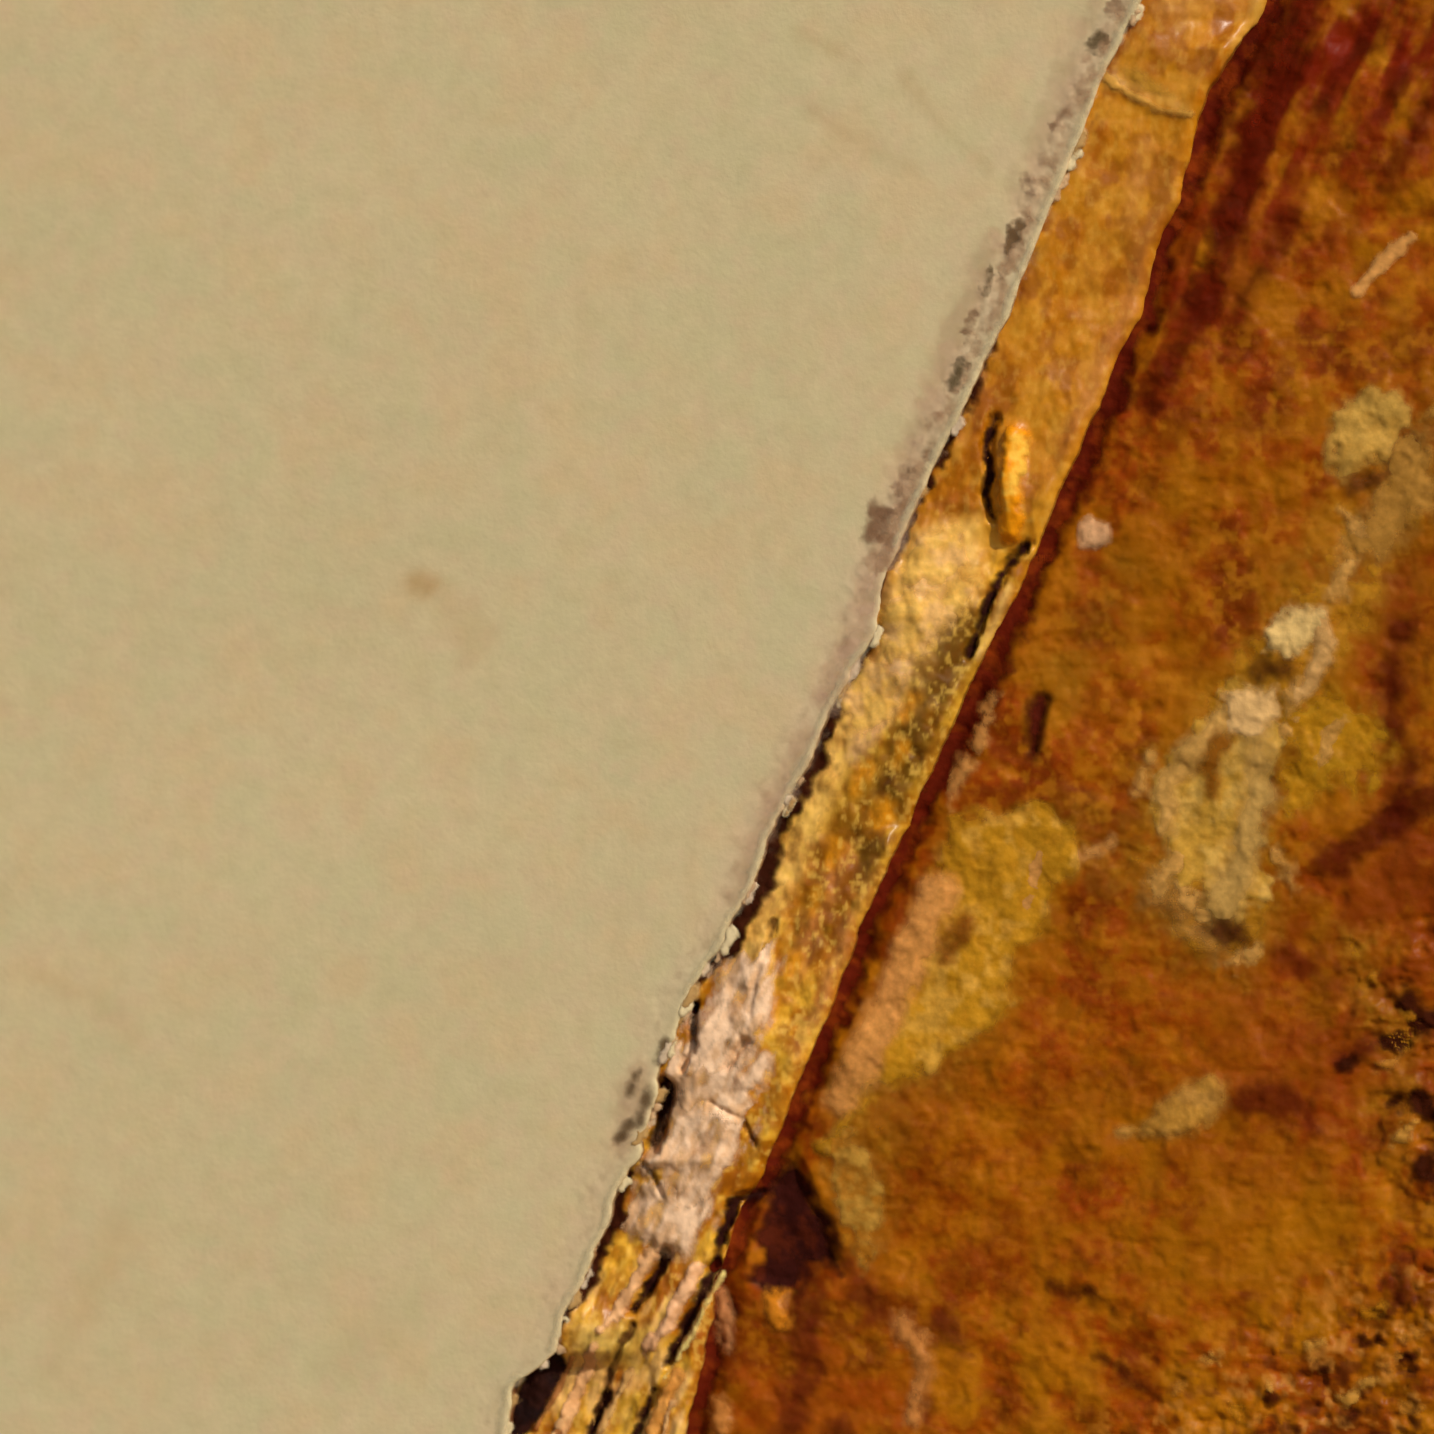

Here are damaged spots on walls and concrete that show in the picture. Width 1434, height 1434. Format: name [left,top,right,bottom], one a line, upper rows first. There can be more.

corrosion [1144,0,1320,413]
peeling [1351,232,1417,297]
spalling [501,0,1267,1434]
crack [588,0,1284,1434]
peeling [815,387,1434,1266]
corrosion [1317,762,1434,874]
crack [562,1077,675,1323]
corrosion [1394,1121,1417,1142]
corrosion [1263,1384,1281,1404]
corrosion [1340,1326,1424,1425]